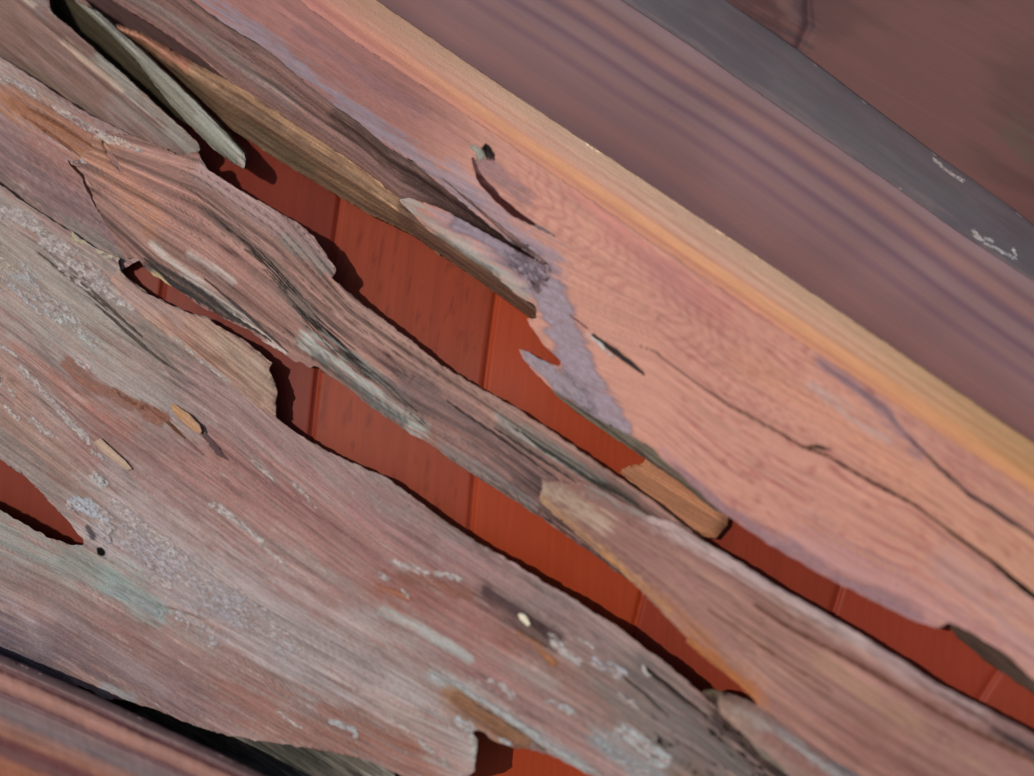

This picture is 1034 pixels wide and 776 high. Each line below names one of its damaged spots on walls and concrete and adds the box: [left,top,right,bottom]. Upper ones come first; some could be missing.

peeling [94,130,144,152]
crack [471,158,555,237]
peeling [90,269,278,415]
peeling [0,375,55,437]
crack [570,315,1034,599]
peeling [434,570,463,582]